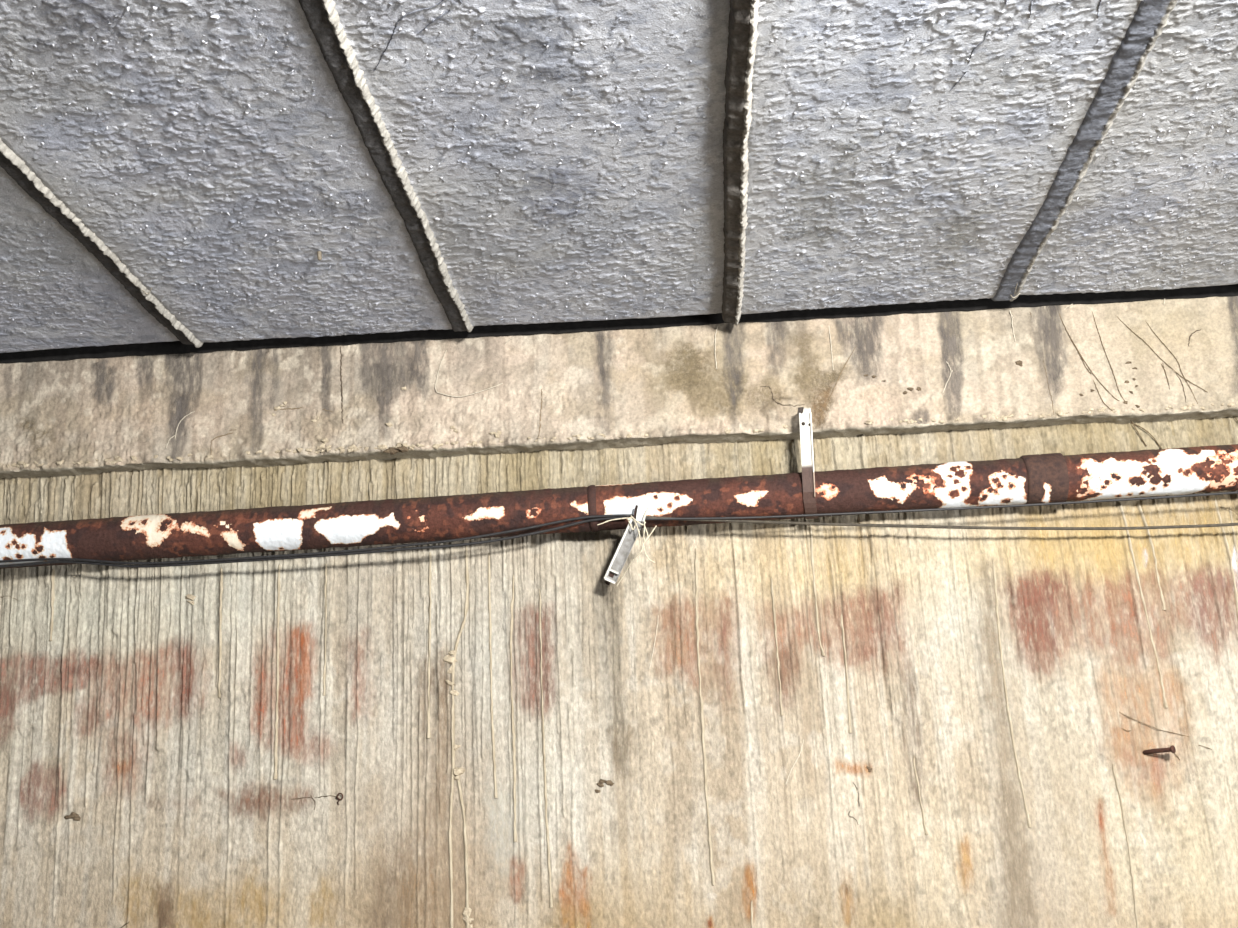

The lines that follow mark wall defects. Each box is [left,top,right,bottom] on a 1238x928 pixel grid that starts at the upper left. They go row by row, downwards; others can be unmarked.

crack [374,0,462,71]
leakage [139,353,201,457]
spalling [245,426,503,455]
leakage [361,340,427,413]
leakage [597,331,609,404]
leakage [836,317,876,362]
leakage [940,311,962,412]
leakage [1035,305,1062,380]
crack [1163,329,1201,402]
peeling [1042,483,1052,503]
corrosion [255,633,305,749]
corrosion [241,789,278,808]